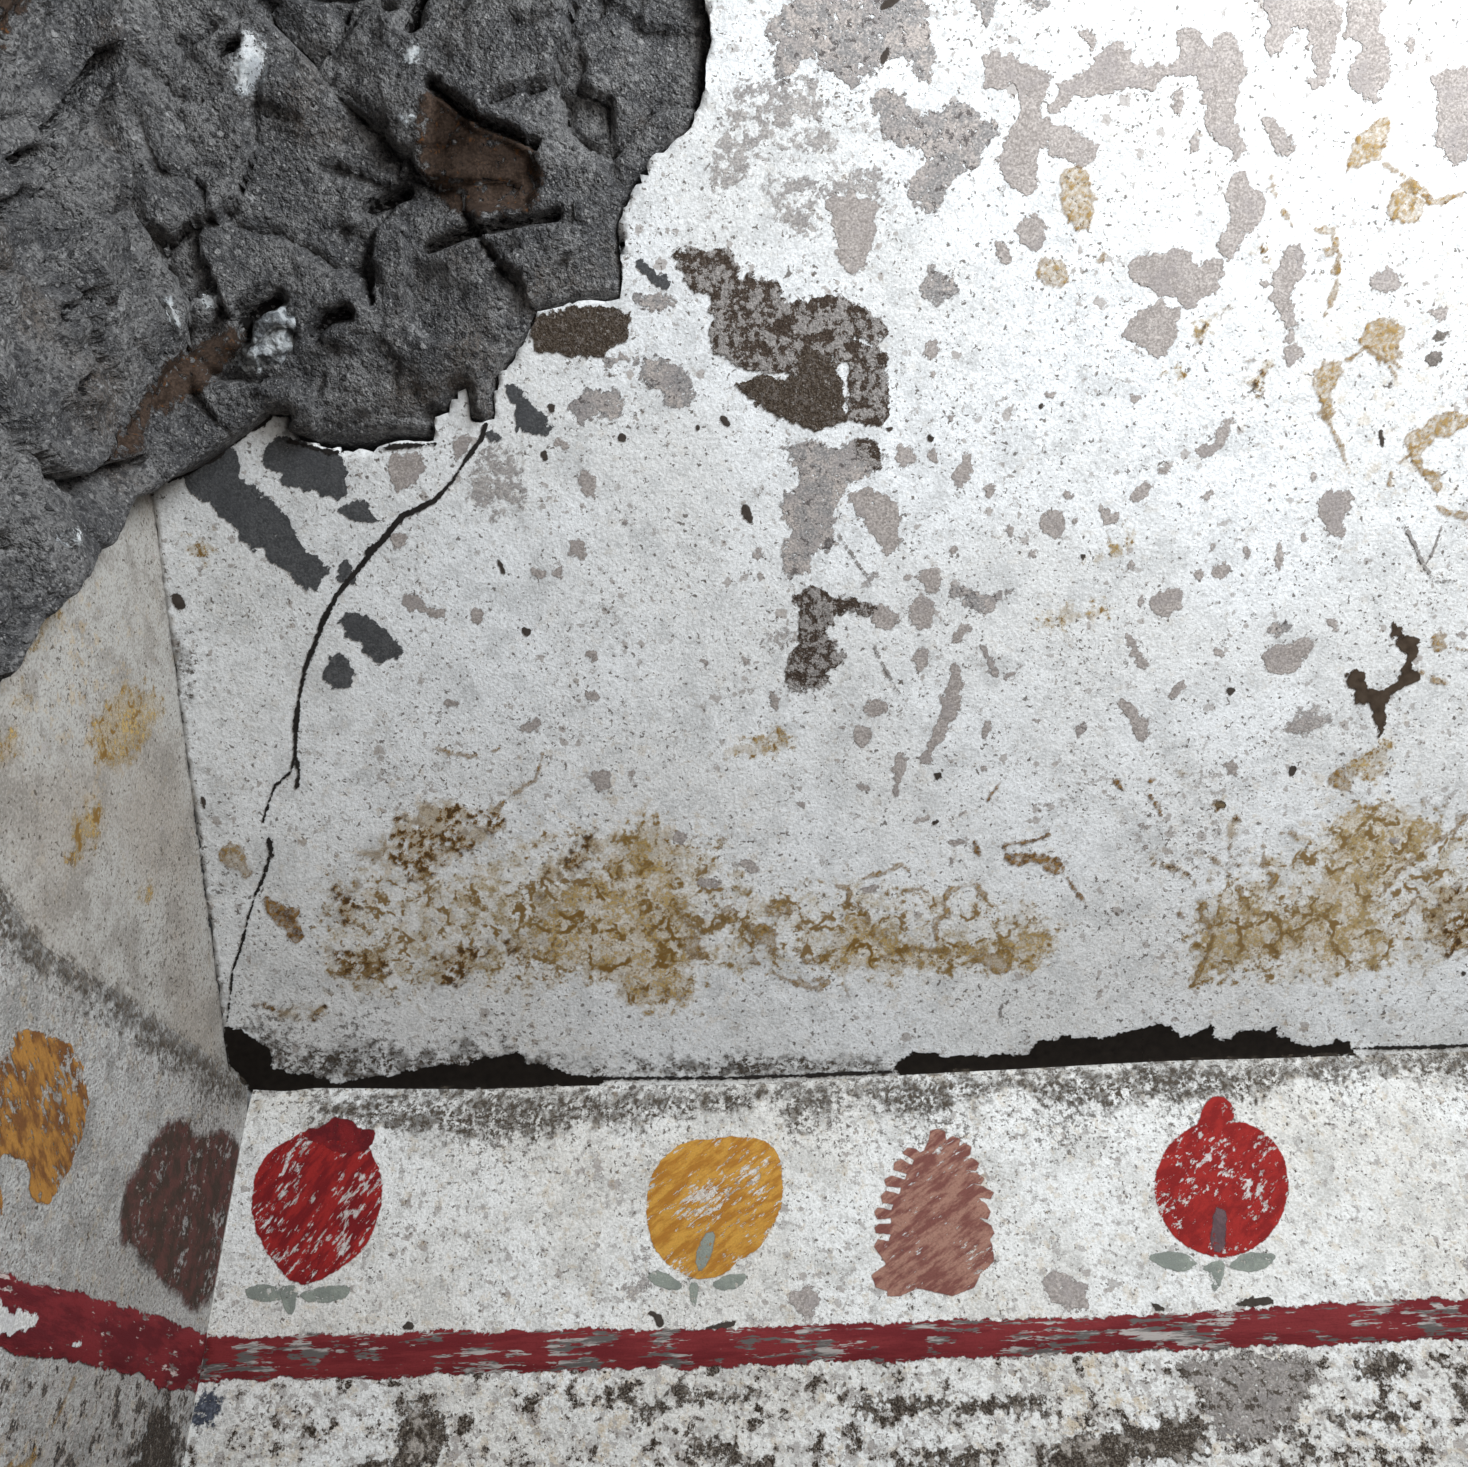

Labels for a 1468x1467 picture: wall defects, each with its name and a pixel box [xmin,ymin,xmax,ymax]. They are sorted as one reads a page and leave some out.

peeling [1254,0,1416,103]
spalling [0,0,1266,711]
peeling [1260,243,1308,367]
crack [163,415,343,485]
crack [226,422,488,1022]
peeling [891,662,965,797]
peeling [1261,619,1314,675]
spalling [1345,621,1421,738]
water stain [443,824,1060,995]
water stain [1181,816,1468,985]
spalling [224,1026,605,1092]
spalling [895,1024,1356,1075]